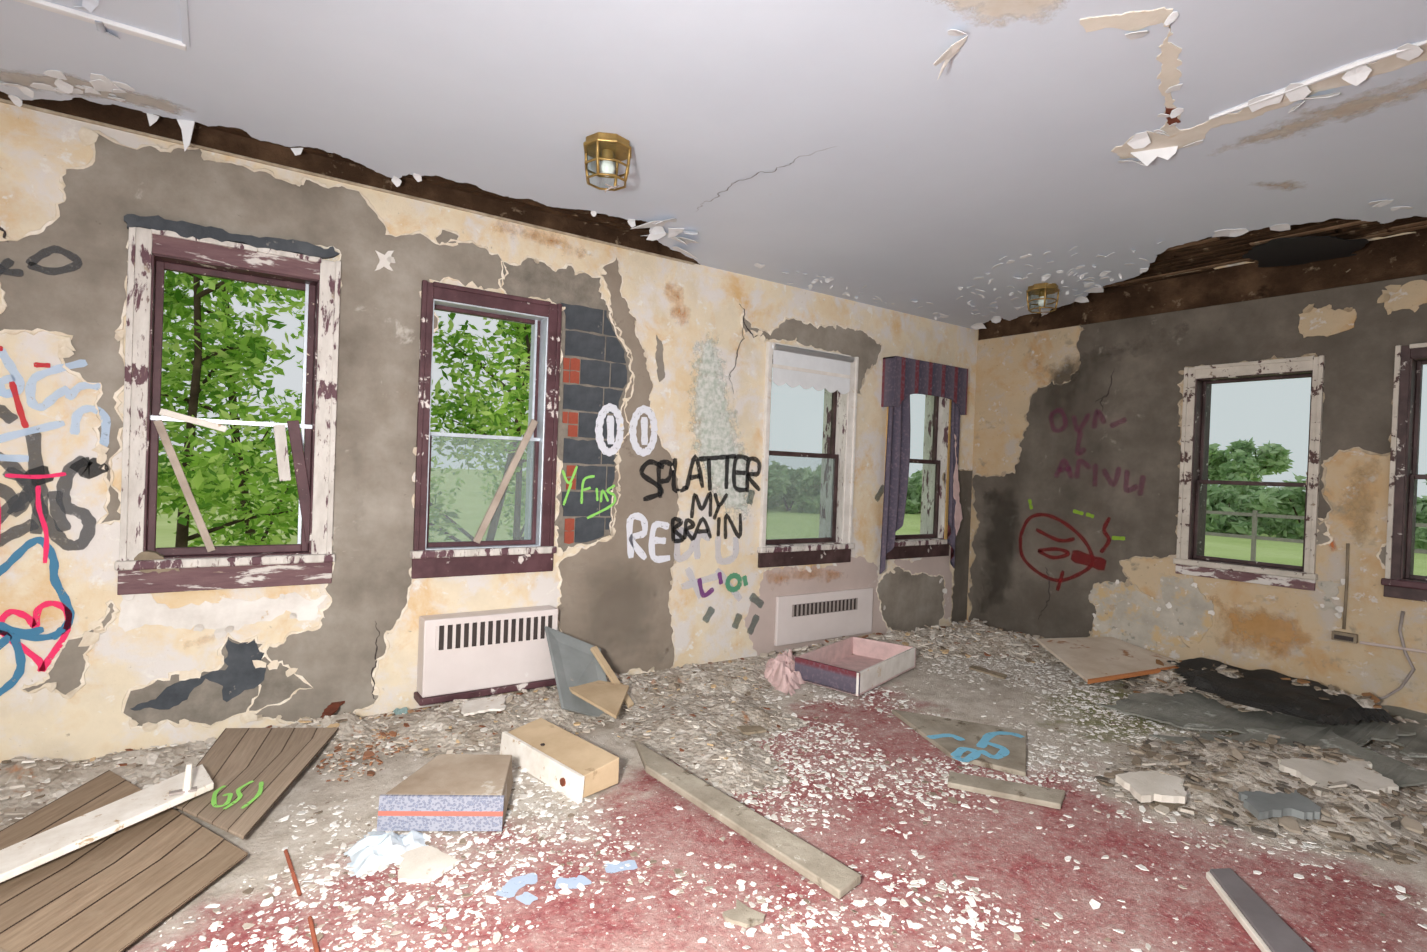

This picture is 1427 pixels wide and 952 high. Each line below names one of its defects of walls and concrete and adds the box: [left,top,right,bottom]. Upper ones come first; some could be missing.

peeling [1,70,135,107]
peeling [1080,7,1427,166]
peeling [627,218,699,259]
peeling [1212,228,1249,238]
peeling [956,246,1149,330]
flaking render [0,119,683,732]
flaking render [740,269,1427,656]